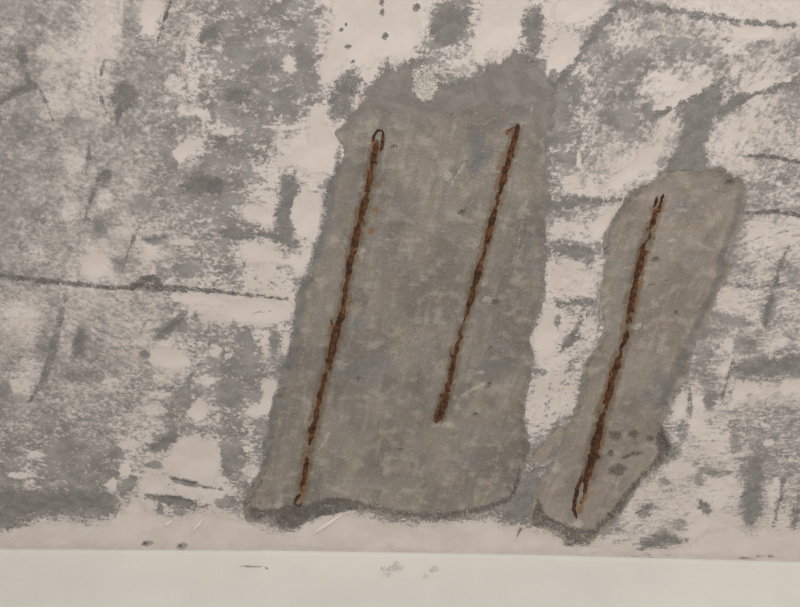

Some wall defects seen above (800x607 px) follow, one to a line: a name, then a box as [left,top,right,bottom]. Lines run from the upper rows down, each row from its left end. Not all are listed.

peeling [319,0,424,90]
peeling [425,0,471,48]
peeling [467,0,551,64]
peeling [545,32,581,77]
crack [0,273,288,403]
spalling [0,49,639,557]
corrosion [295,139,381,503]
corrosion [432,123,523,428]
corrosion [577,198,665,514]
spalling [529,168,747,545]
peeling [637,490,800,561]